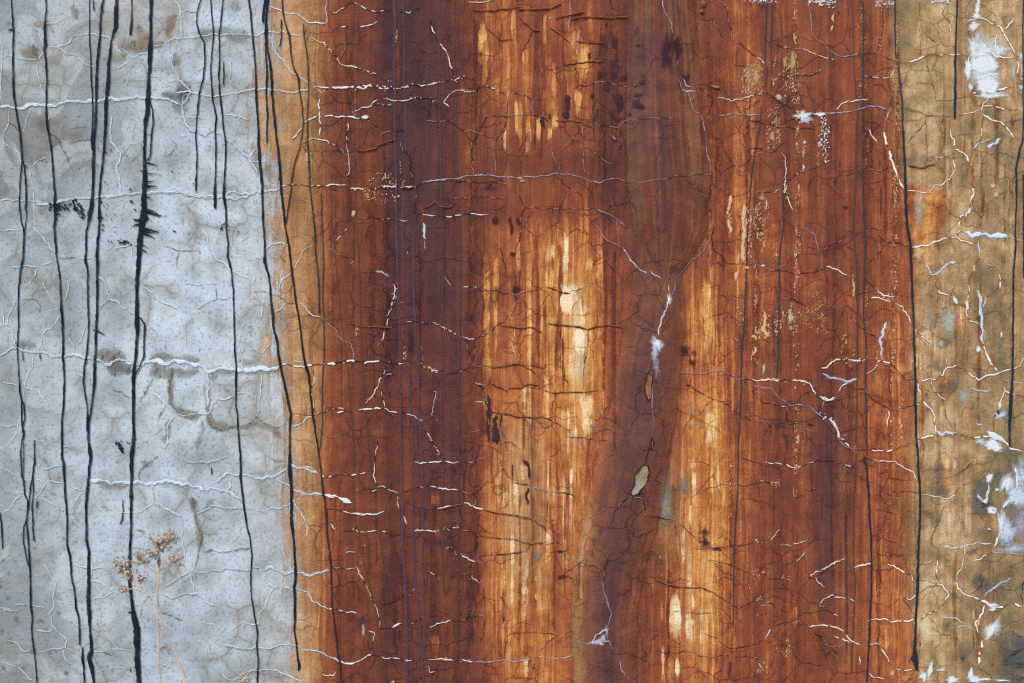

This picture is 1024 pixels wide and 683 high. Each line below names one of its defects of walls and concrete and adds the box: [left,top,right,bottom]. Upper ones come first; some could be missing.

water stain [122,15,177,51]
water stain [162,87,191,111]
crack [0,0,860,335]
water stain [97,350,132,374]
water stain [149,354,280,441]
corrosion [235,0,636,683]
spalling [644,370,653,401]
corrosion [636,0,1024,683]
crack [651,0,1024,680]
crack [0,222,636,683]
spalling [630,463,650,497]
crack [611,496,807,574]